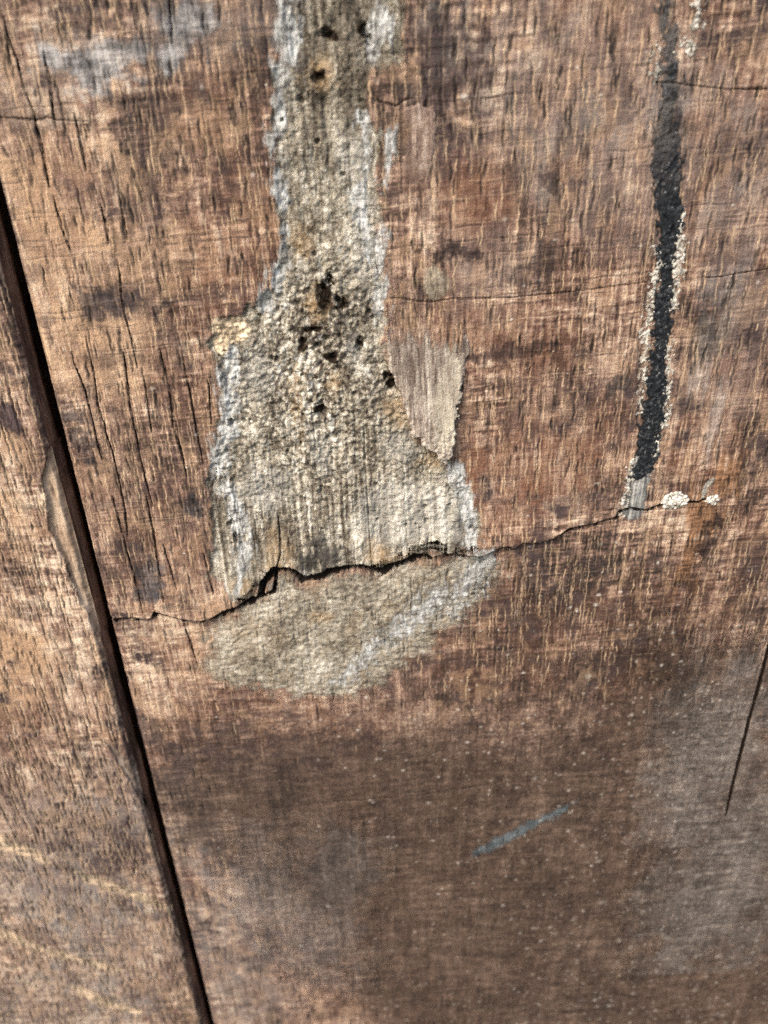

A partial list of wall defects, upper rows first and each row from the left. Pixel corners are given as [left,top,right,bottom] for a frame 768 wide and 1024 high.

spalling [206,0,483,603]
crack [72,263,706,665]
water stain [607,0,706,520]
crack [725,644,768,816]